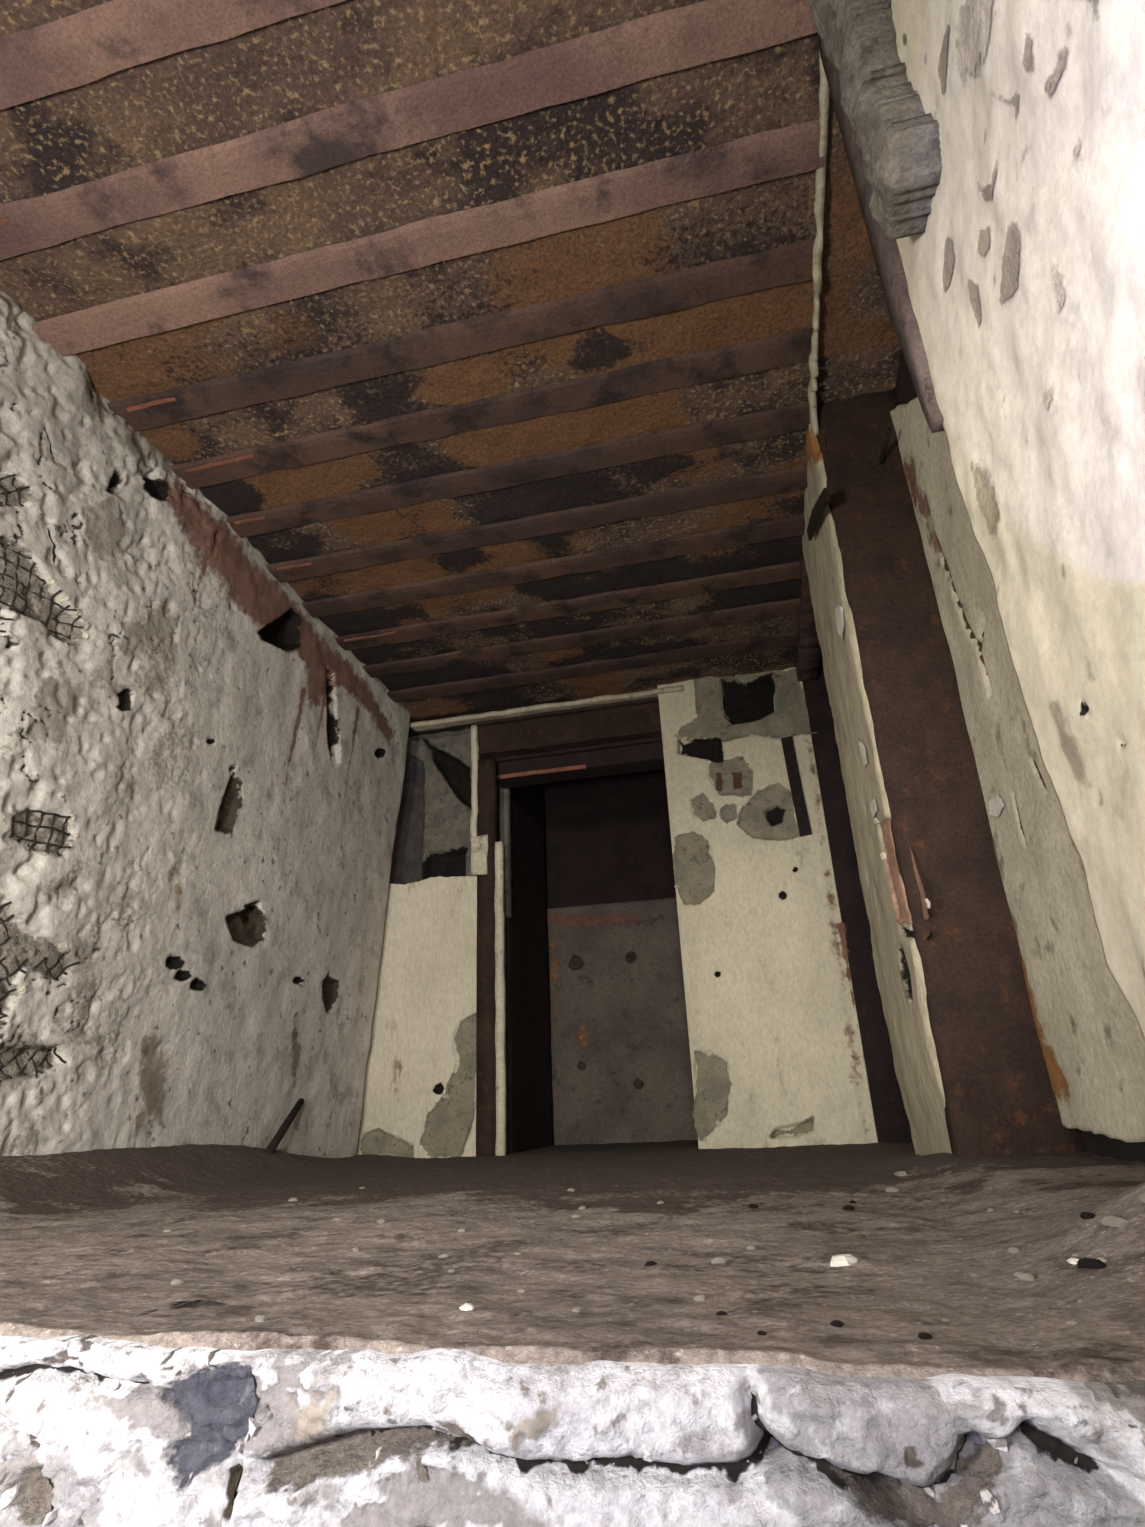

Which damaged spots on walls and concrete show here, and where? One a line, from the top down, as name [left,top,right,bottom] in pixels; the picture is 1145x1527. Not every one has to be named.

peeling [943,222,1021,326]
corrosion [903,457,943,553]
spalling [0,535,89,647]
corrosion [165,454,396,797]
spalling [10,809,78,857]
spalling [673,668,817,905]
spalling [0,894,80,1081]
corrosion [1019,953,1069,1103]
crack [0,1363,150,1384]
spalling [160,1361,506,1494]
crack [315,1392,967,1524]
crack [1020,1422,1099,1474]